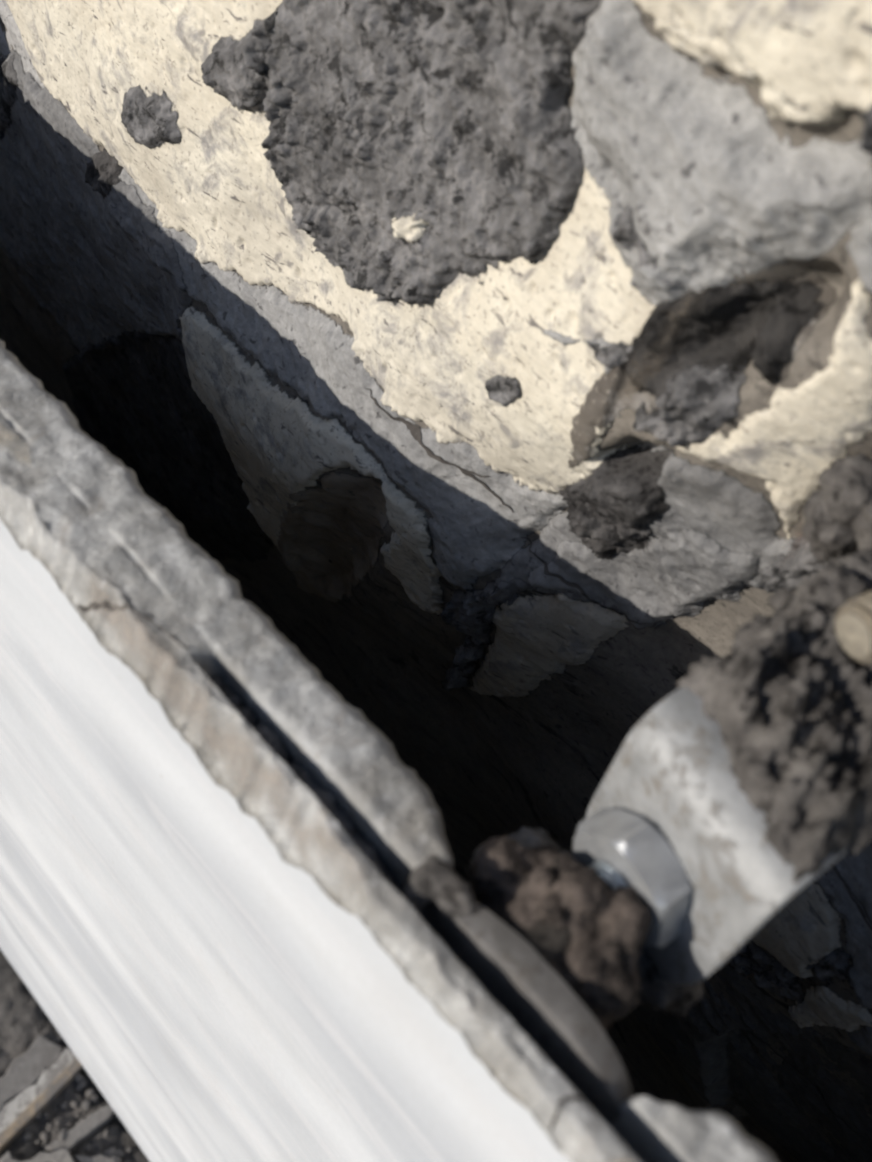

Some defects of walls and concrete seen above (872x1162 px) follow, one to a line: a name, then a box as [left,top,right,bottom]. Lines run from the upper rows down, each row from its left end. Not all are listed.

spalling [766,273,837,380]
spalling [568,363,660,468]
crack [78,600,189,650]